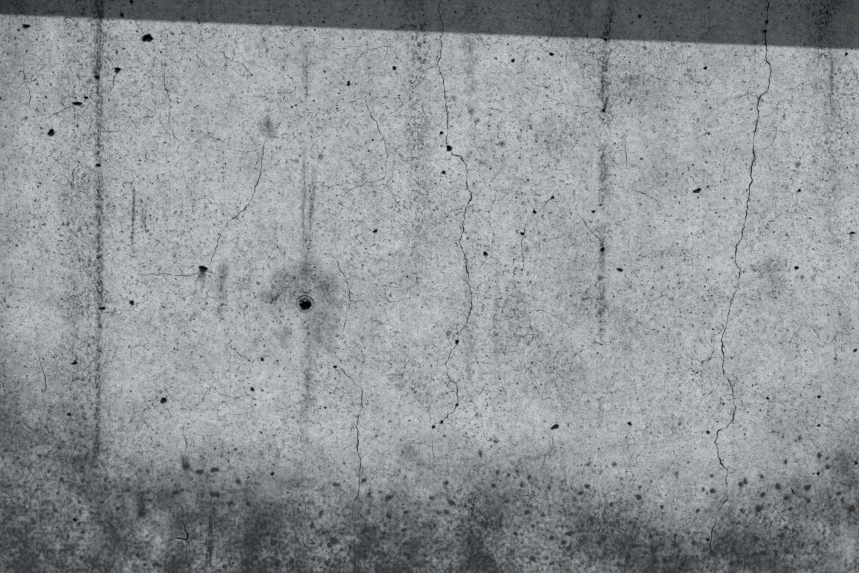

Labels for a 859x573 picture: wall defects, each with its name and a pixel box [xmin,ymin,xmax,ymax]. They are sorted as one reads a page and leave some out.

leakage [0,176,859,573]
crack [428,0,473,474]
crack [709,0,772,557]